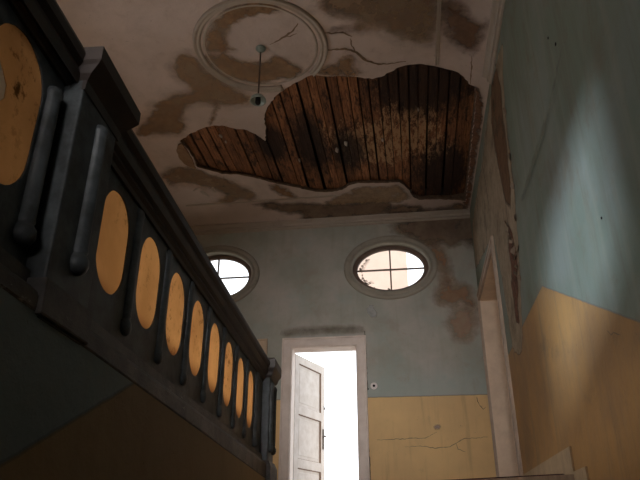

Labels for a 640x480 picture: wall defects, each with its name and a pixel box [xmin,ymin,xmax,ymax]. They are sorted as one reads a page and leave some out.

water stain [137,3,301,136]
crack [272,23,298,44]
crack [326,31,406,65]
water stain [322,0,484,50]
water stain [164,167,254,203]
spalling [180,73,476,206]
water stain [264,87,483,219]
peeling [473,44,523,355]